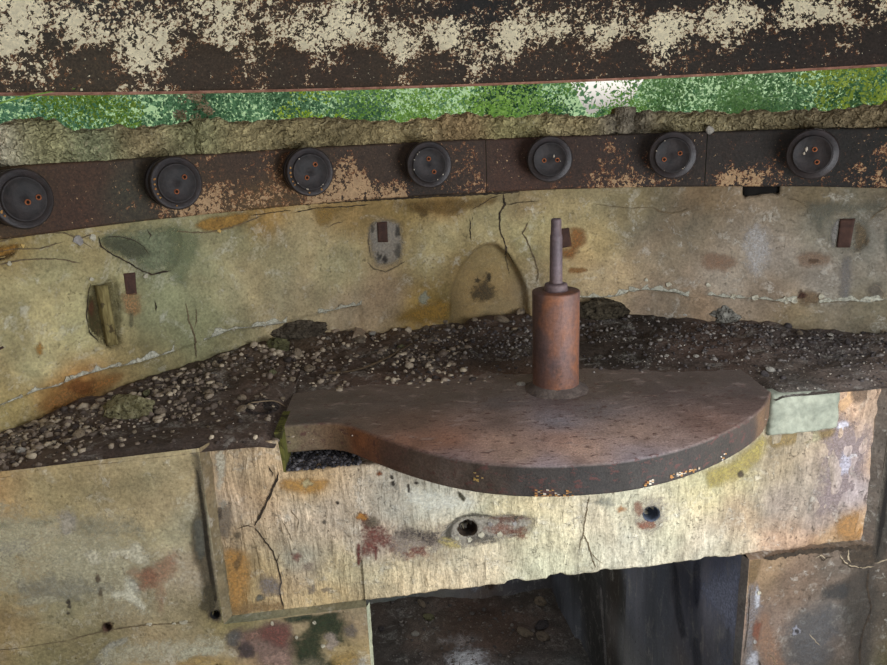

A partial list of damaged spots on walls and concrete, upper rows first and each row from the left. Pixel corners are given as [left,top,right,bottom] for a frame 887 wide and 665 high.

rust [398,199,493,216]
crack [235,191,539,280]
rust [562,228,585,257]
crack [186,306,197,358]
rust [281,479,326,493]
crack [237,466,299,608]
rust [356,513,395,564]